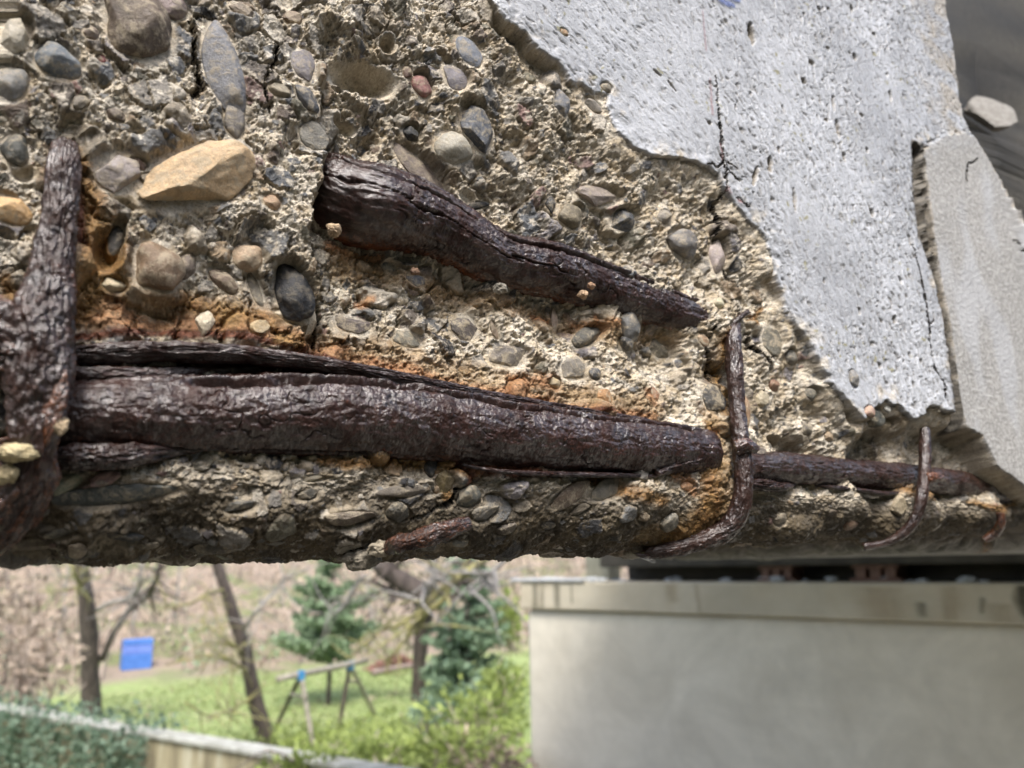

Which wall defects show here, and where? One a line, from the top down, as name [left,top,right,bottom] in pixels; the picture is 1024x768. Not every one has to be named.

corrosion [0,152,1017,544]
spalling [0,0,1024,570]
crack [707,75,750,238]